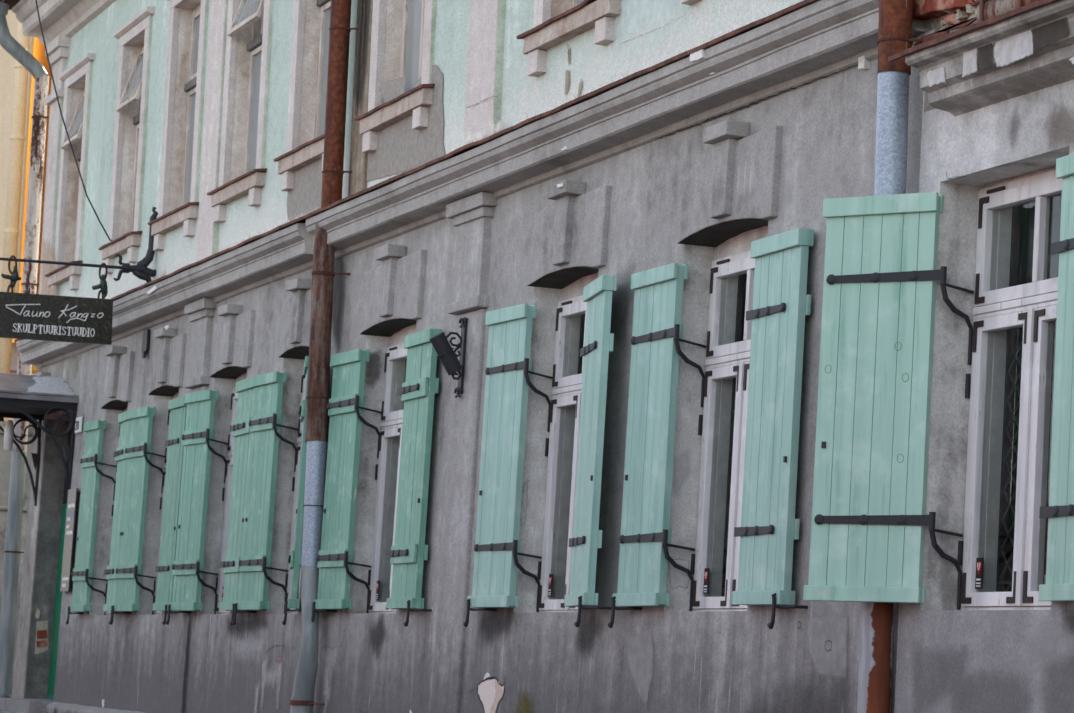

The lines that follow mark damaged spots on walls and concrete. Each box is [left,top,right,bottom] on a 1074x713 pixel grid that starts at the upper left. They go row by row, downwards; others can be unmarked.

rust [877,0,913,76]
peeling [927,67,945,86]
peeling [962,49,977,77]
peeling [994,30,1033,67]
spalling [467,673,506,713]